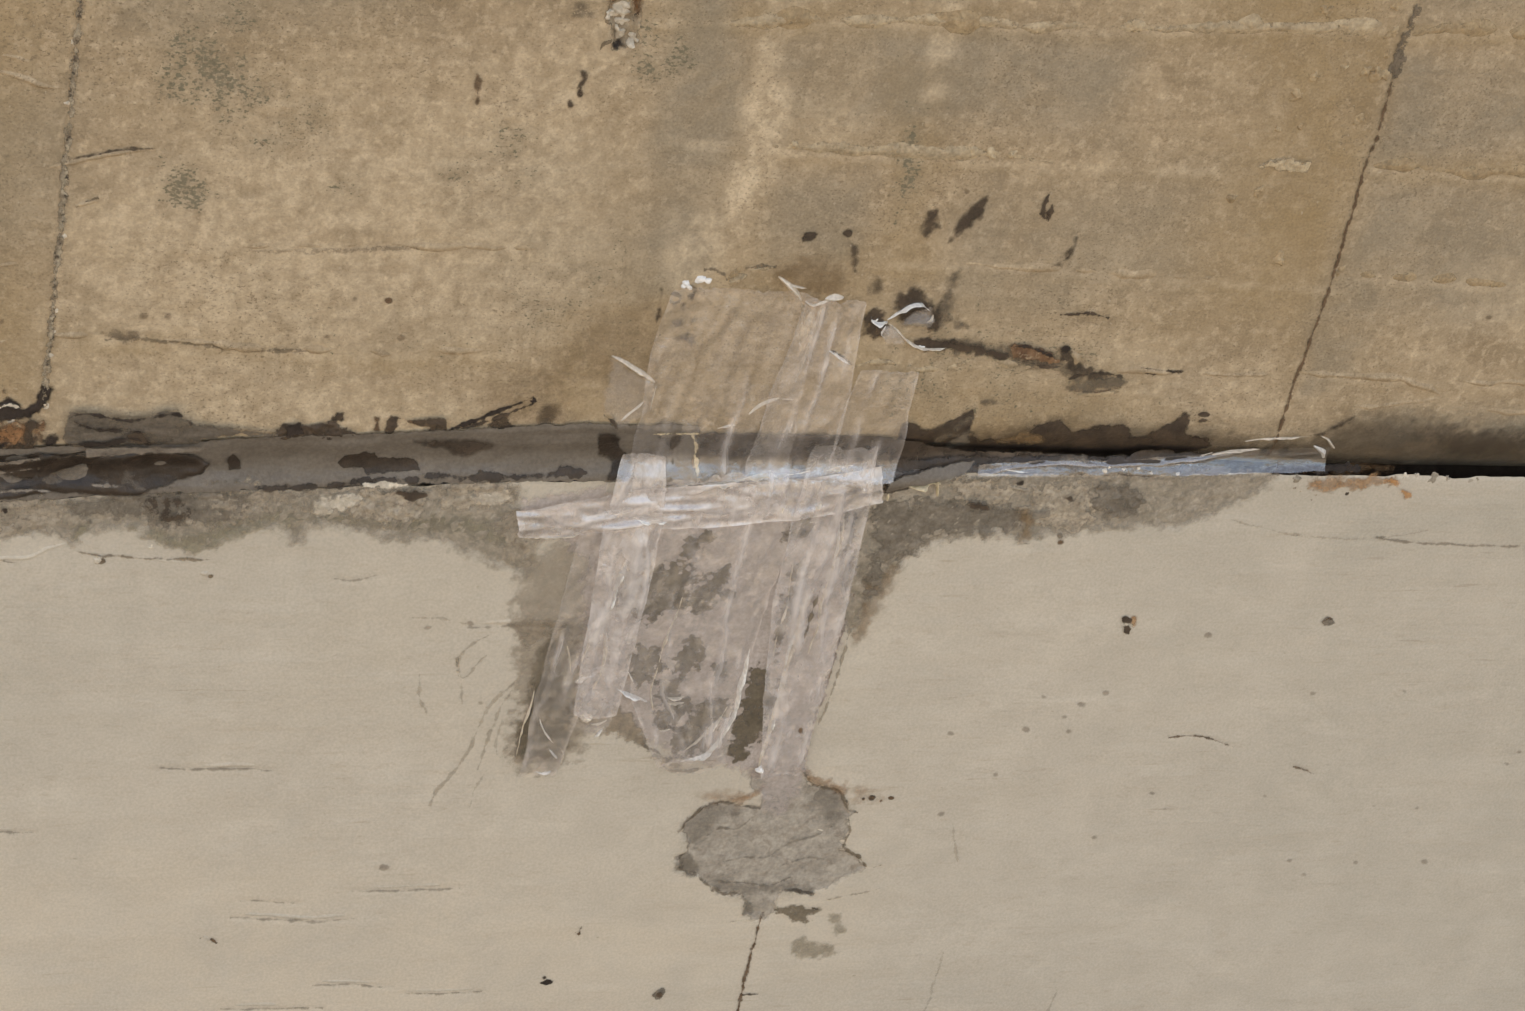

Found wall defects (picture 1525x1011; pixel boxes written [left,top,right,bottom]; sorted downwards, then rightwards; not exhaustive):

spalling [600,0,642,50]
crack [42,0,84,408]
crack [1267,5,1422,456]
corrosion [0,420,46,449]
peeling [63,412,278,448]
water stain [896,400,1211,458]
spalling [676,763,894,919]
crack [736,915,762,1011]